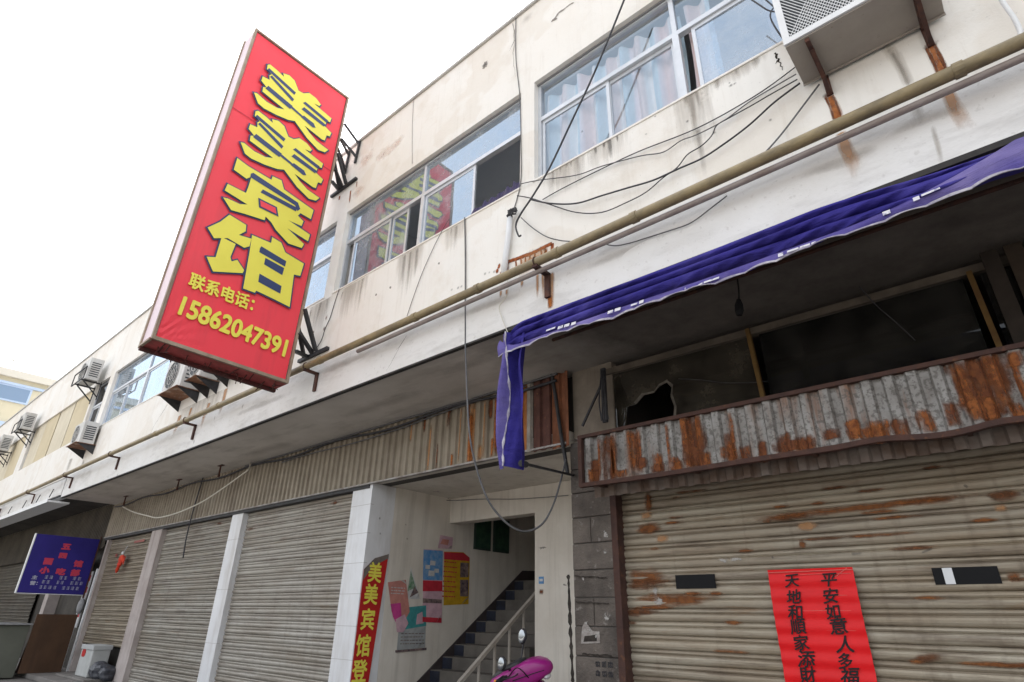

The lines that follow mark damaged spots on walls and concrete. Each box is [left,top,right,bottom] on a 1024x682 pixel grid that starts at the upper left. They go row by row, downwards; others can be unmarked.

corrosion [925,45,947,72]
corrosion [824,95,841,120]
corrosion [496,242,554,273]
corrosion [536,273,554,307]
corrosion [944,351,1024,426]
corrosion [447,398,497,466]
corrosion [588,410,936,482]
corrosion [638,494,680,550]
corrosion [763,488,950,547]
corrosion [973,491,1017,522]
corrosion [628,571,721,624]
corrosion [910,654,938,664]